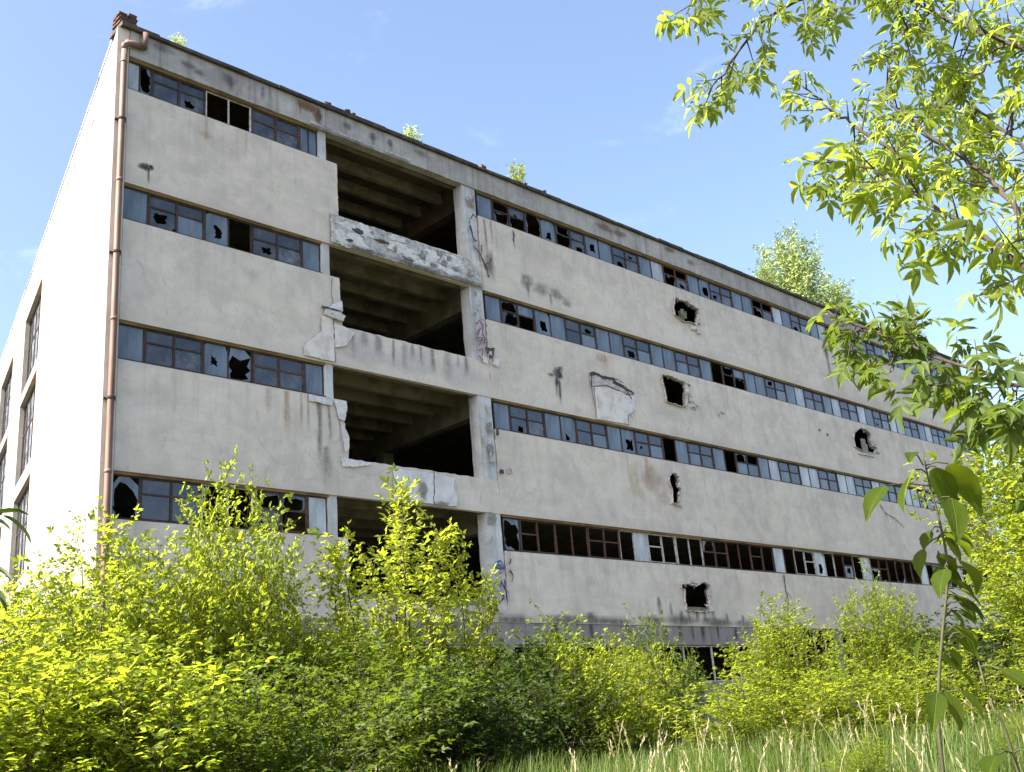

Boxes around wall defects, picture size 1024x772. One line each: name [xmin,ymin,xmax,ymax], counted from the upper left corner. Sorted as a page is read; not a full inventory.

peeling [330,213,500,366]
peeling [322,300,355,347]
spalling [672,297,701,335]
spalling [309,395,347,421]
spalling [589,372,635,415]
spalling [661,374,699,410]
peeling [342,437,372,467]
spalling [853,427,880,458]
spalling [668,472,683,508]
spalling [680,580,714,612]